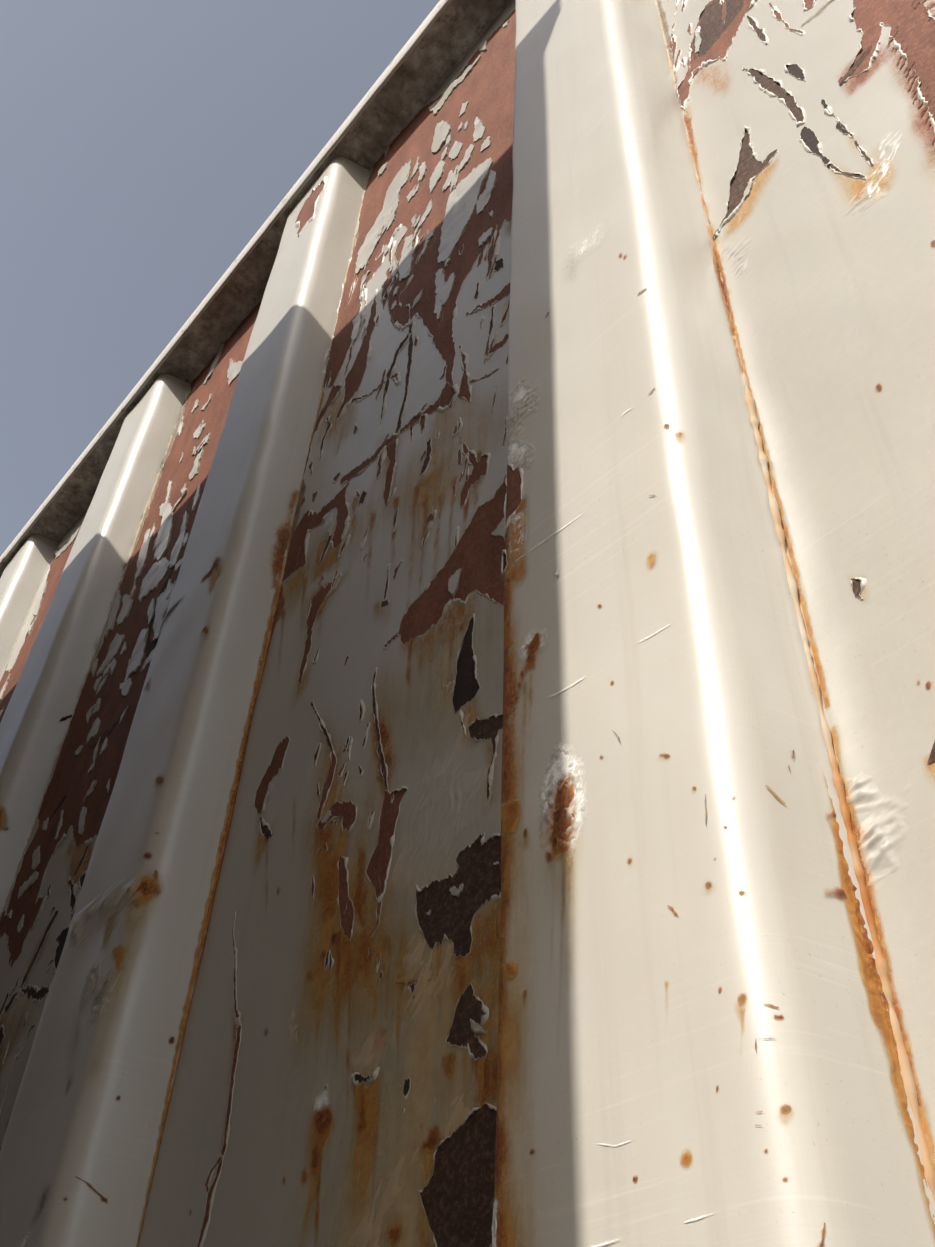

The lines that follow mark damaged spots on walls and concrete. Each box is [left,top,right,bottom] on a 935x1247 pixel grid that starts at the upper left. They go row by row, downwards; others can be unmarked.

peeling [0,300,262,1047]
corrosion [134,480,306,1247]
corrosion [301,1107,332,1238]
peeling [311,667,408,984]
peeling [273,9,526,802]
corrosion [330,536,588,1247]
peeling [669,0,758,110]
peeling [712,125,778,240]
corrosion [709,222,829,708]
corrosion [851,577,867,600]
corrosion [827,728,935,1233]
peeling [838,0,935,157]